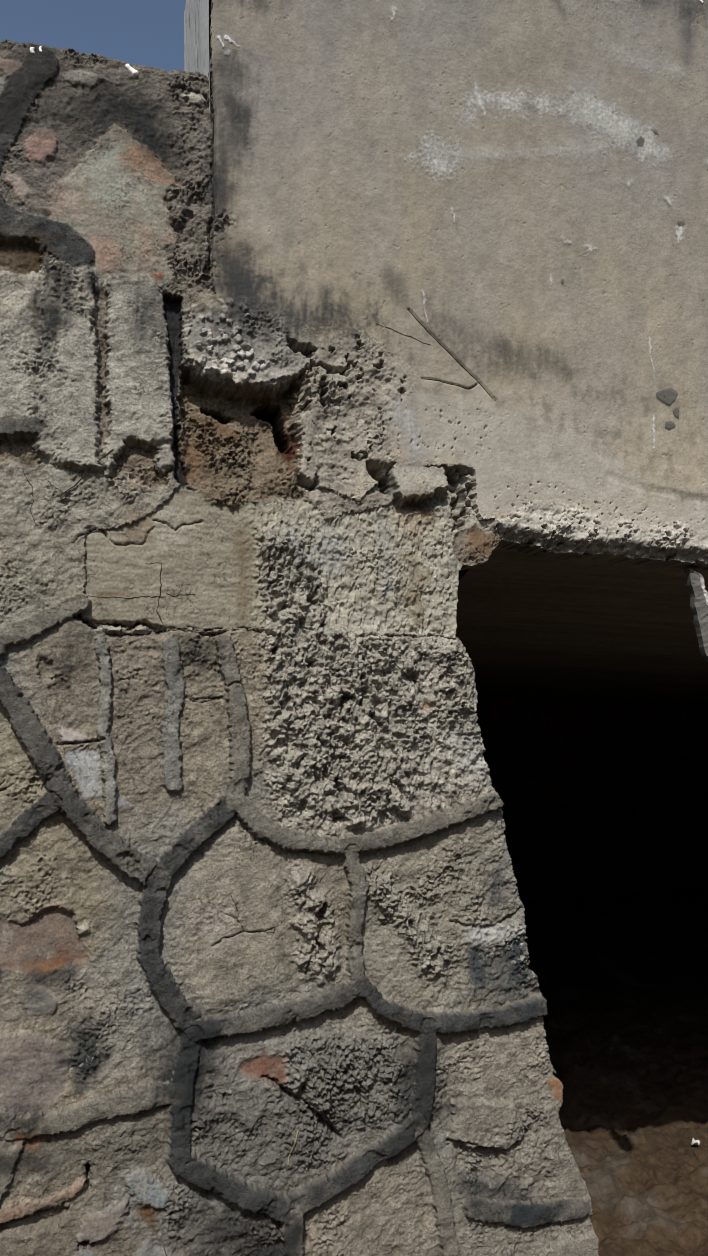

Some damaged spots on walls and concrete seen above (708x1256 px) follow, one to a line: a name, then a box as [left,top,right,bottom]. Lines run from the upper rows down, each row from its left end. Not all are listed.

damp [409,137,457,175]
damp [466,83,668,162]
spalling [91,282,418,510]
spalling [444,464,708,571]
crack [213,896,272,946]